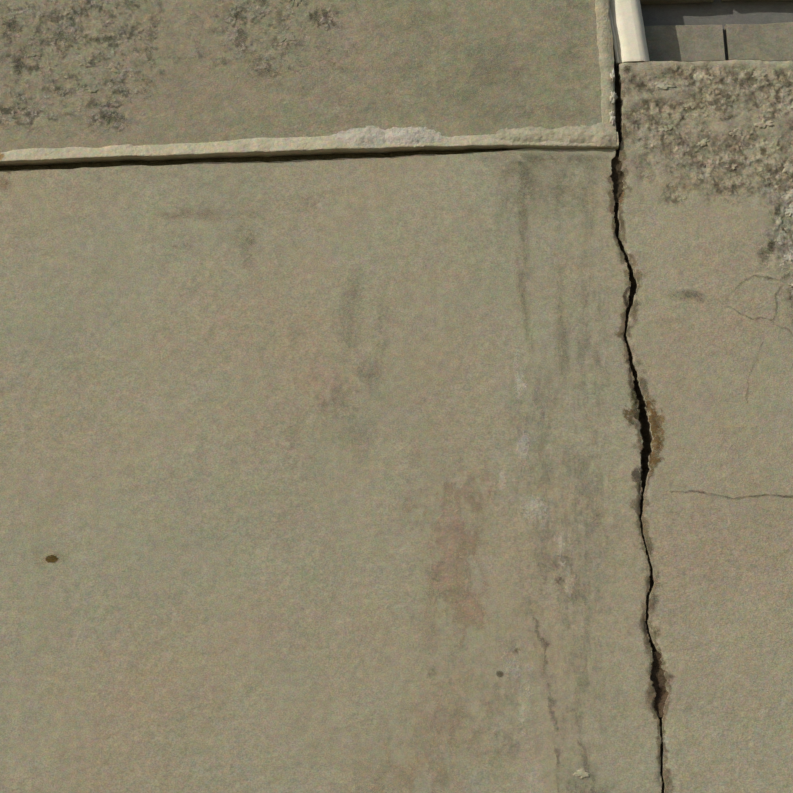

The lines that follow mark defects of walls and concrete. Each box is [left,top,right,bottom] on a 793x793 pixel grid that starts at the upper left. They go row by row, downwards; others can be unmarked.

crack [607,67,673,793]
spalling [624,64,793,307]